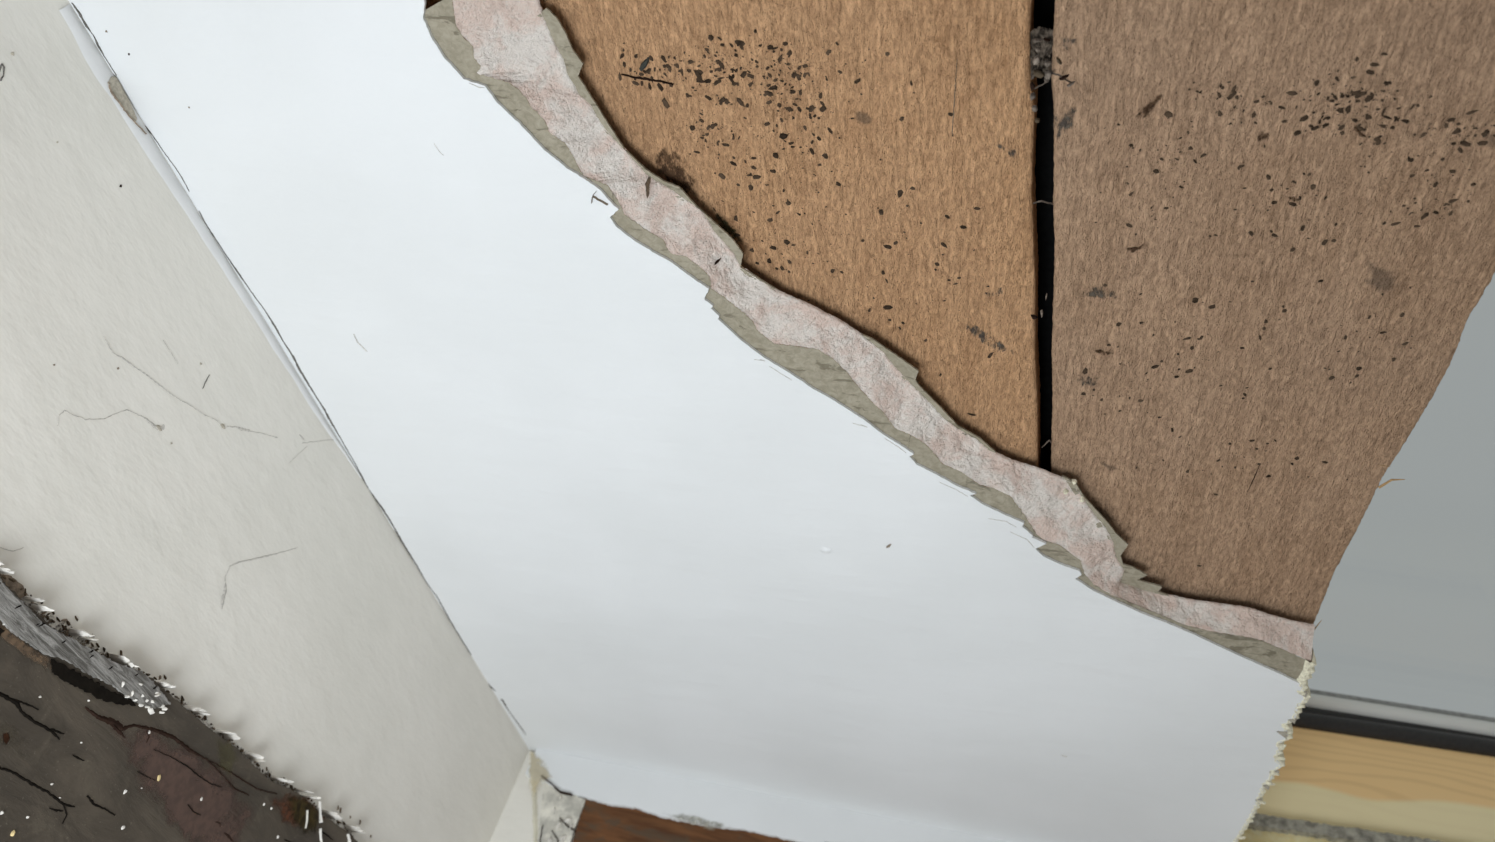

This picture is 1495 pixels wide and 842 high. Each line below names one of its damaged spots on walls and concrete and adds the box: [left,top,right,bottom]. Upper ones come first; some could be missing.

leakage [618,22,1013,358]
spalling [425,0,1317,842]
leakage [1054,109,1075,137]
leakage [1086,272,1118,298]
leakage [1081,297,1287,496]
leakage [1095,52,1495,263]
leakage [1321,287,1423,384]
crack [0,692,277,842]
peeling [0,561,372,838]